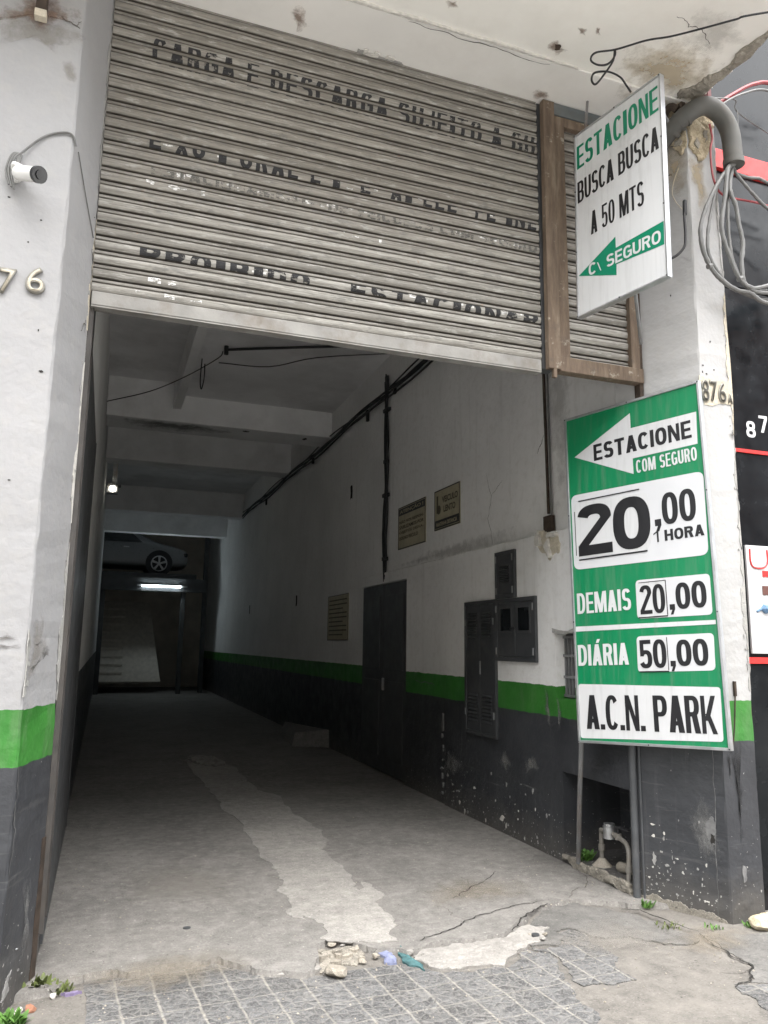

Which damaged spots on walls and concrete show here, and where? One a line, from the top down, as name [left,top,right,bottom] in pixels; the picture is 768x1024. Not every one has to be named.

water stain [640,56,689,86]
spalling [668,31,768,119]
spalling [670,116,714,162]
flaking render [534,530,561,560]
crack [422,870,588,940]
spalling [551,816,728,924]
crack [627,909,754,986]